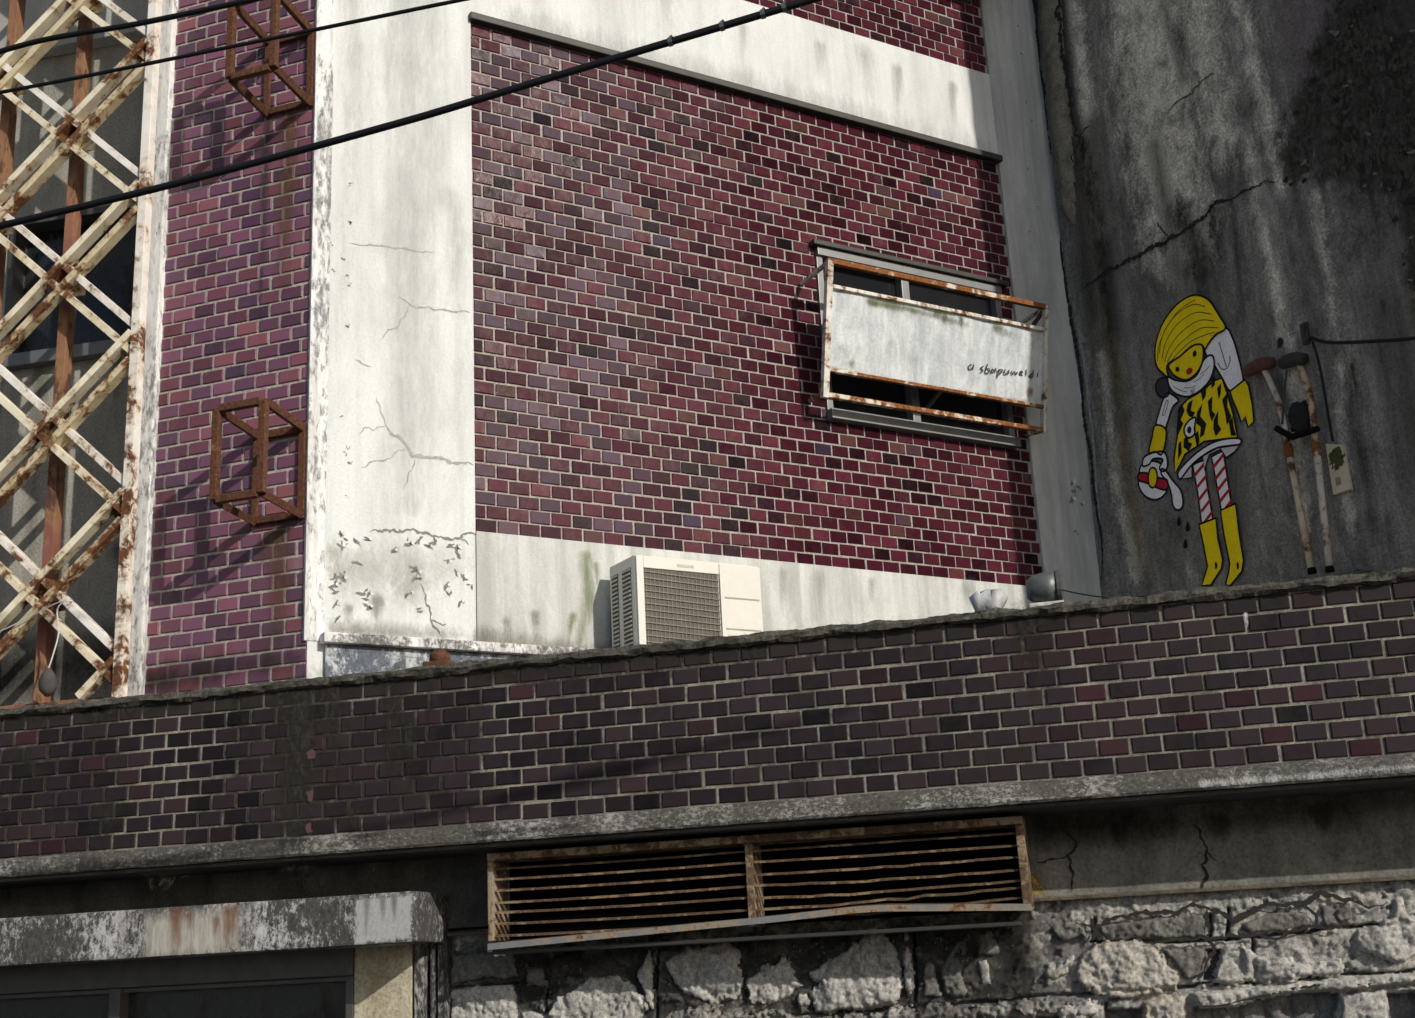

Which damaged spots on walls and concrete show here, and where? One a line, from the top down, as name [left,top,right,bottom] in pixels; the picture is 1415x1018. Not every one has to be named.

crack [1084,179,1275,289]
crack [355,297,473,488]
peeling [329,531,374,623]
peeling [391,536,473,613]
crack [1037,821,1396,1007]